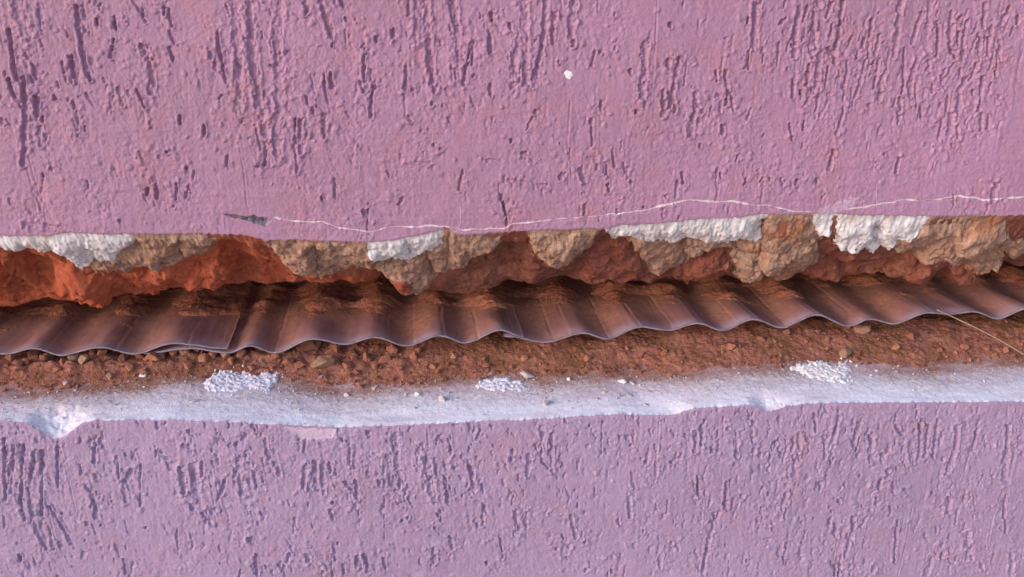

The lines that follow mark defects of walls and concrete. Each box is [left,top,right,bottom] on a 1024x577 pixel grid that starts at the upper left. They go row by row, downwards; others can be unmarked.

spalling [224,214,268,227]
crack [262,196,811,233]
crack [847,192,1024,210]
spalling [0,232,225,274]
spalling [263,228,503,296]
spalling [526,213,1024,284]